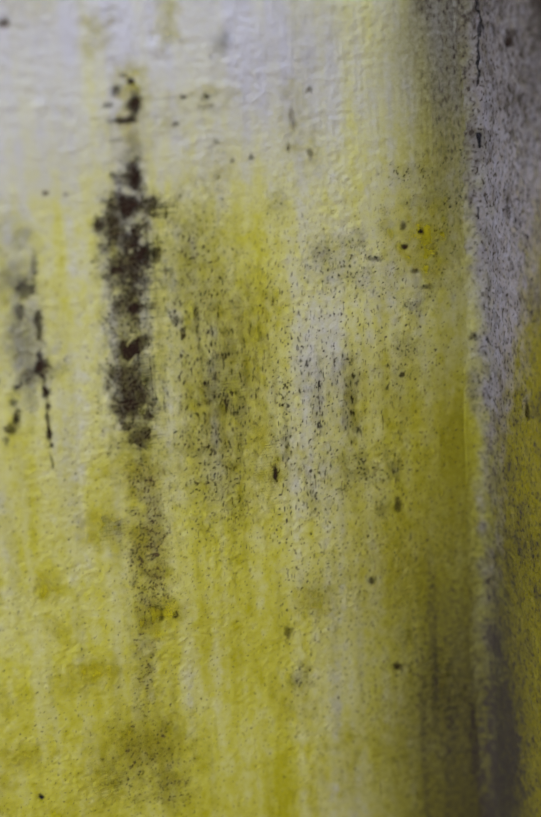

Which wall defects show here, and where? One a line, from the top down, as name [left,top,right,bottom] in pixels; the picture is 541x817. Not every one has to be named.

water stain [111,78,141,124]
water stain [4,401,19,441]
water stain [15,267,37,320]
water stain [14,311,53,447]
water stain [92,156,178,689]
water stain [171,211,259,504]